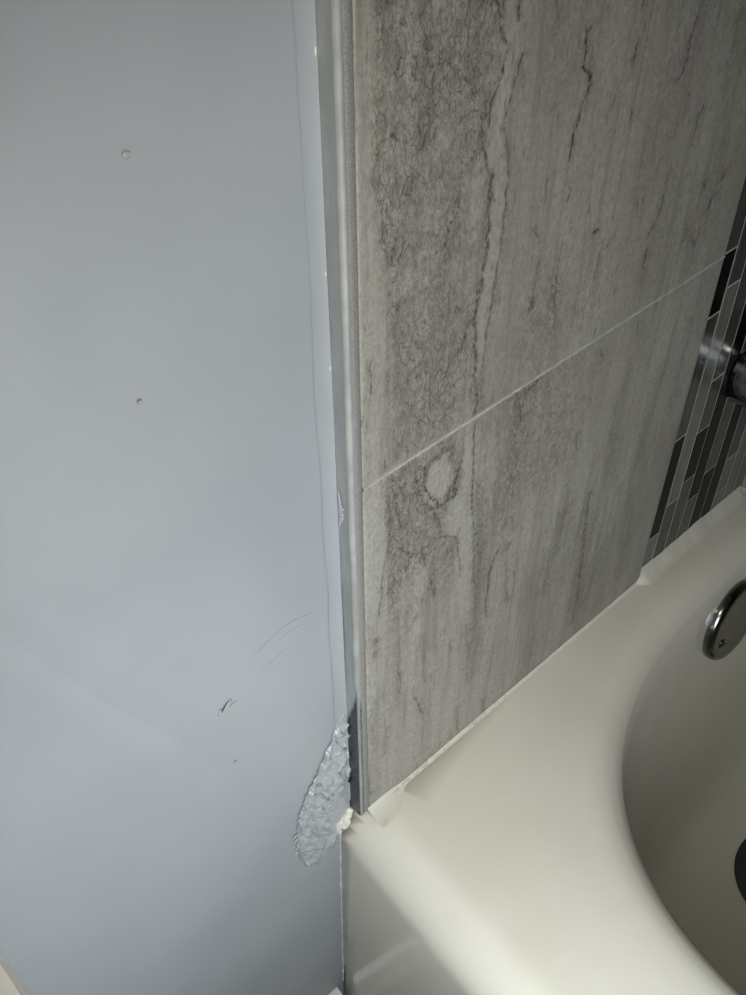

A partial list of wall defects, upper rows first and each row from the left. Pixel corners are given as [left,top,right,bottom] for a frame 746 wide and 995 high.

peeling [293,715,351,867]